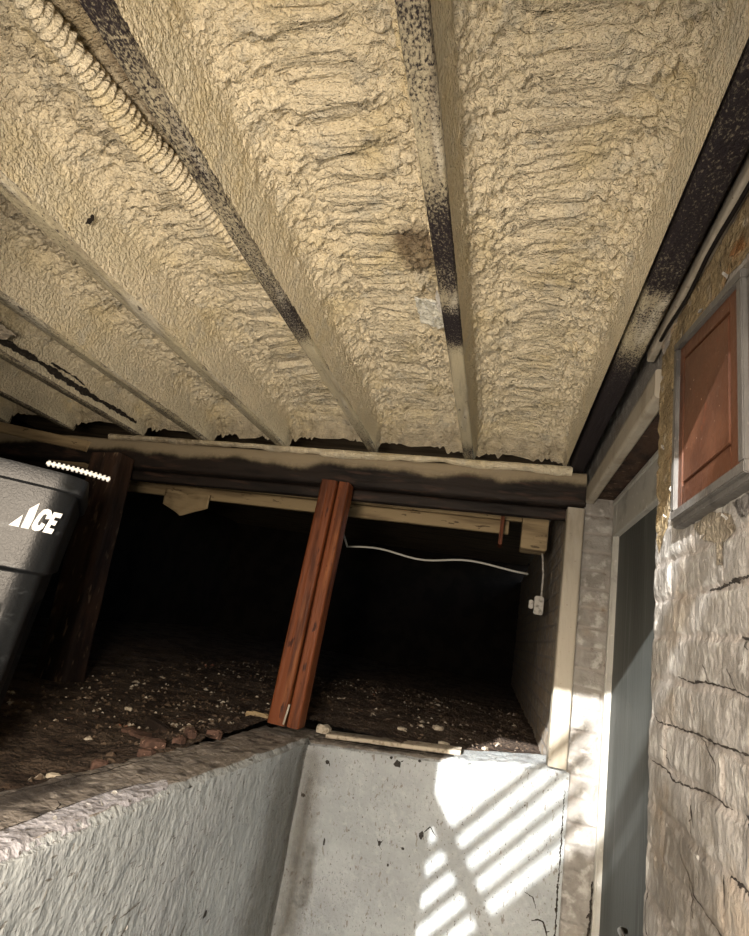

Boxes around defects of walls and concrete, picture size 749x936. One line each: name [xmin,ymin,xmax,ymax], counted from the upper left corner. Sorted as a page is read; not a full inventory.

crack [710,575,749,591]
peeling [3,659,277,763]
peeling [308,677,529,752]
crack [678,664,749,698]
peeling [28,761,83,782]
crack [650,714,749,828]
peeling [0,779,168,862]
crack [680,854,749,936]